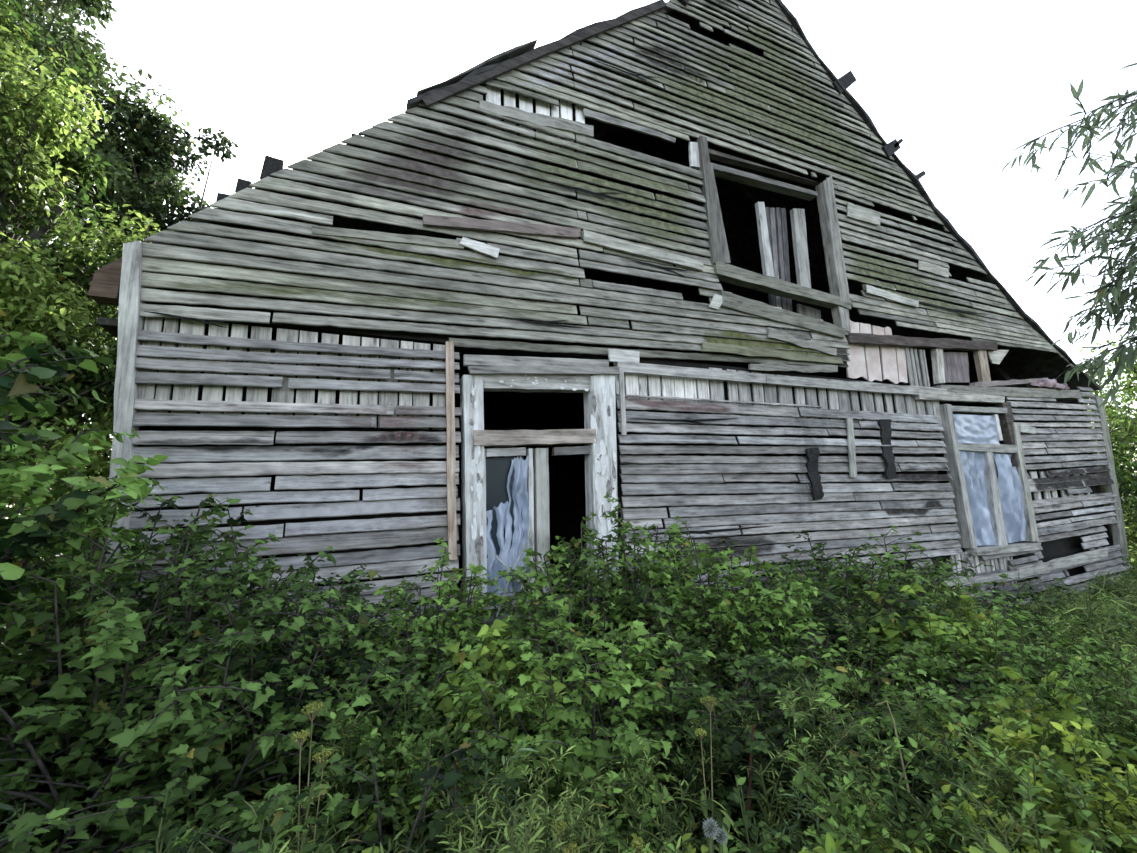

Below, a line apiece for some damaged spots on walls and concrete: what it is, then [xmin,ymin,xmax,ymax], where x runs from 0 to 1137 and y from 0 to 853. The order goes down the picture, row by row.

water stain [634,28,882,191]
water stain [532,147,689,241]
water stain [704,331,849,367]